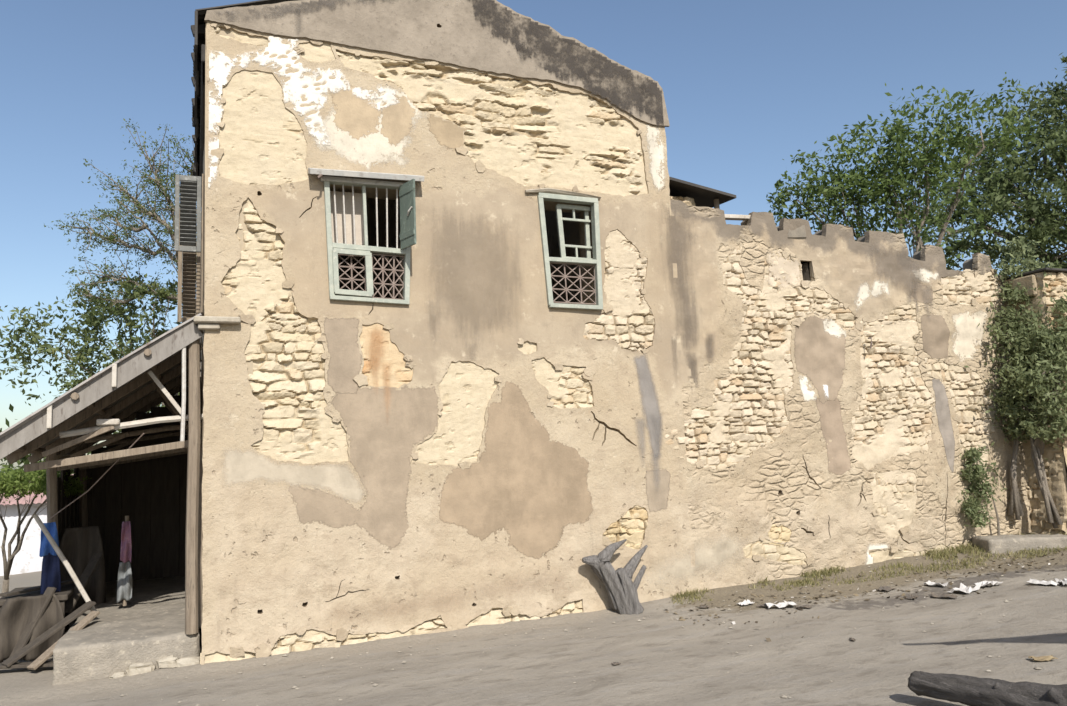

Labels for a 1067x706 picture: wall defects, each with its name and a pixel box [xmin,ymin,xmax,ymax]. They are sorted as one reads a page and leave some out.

damp [249,0,384,17]
damp [469,0,664,126]
flaking render [208,22,666,470]
crack [594,418,632,444]
damp [635,356,660,458]
flaking render [665,242,1003,566]
flaking render [602,505,648,549]
flaking render [466,600,583,627]
flaking render [200,616,446,664]